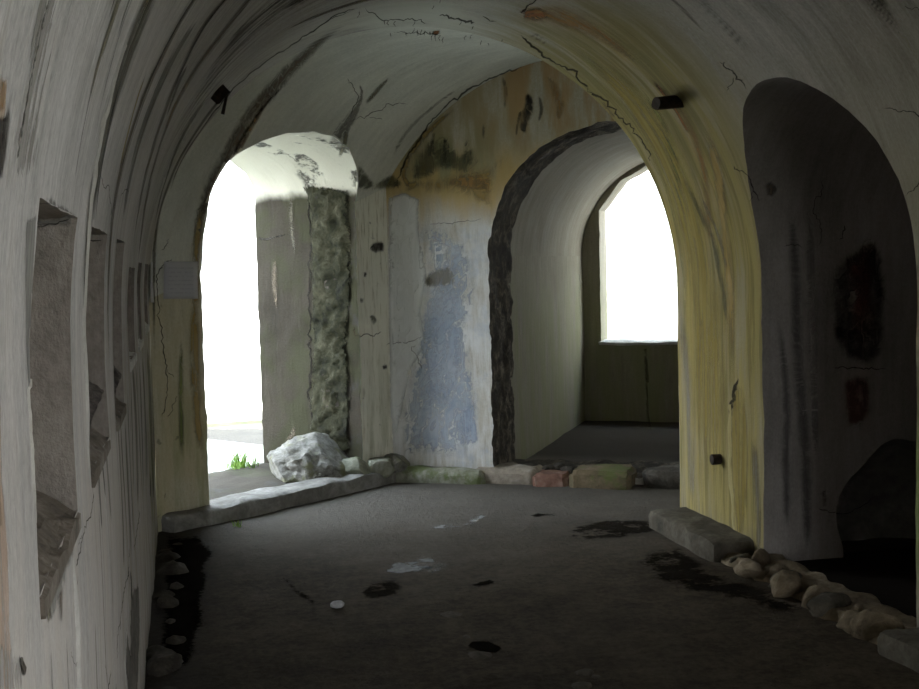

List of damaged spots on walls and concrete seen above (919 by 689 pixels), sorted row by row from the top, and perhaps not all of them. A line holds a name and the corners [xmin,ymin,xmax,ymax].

crack [204,6,493,126]
crack [397,68,518,179]
crack [522,37,651,161]
damp [834,243,884,362]
crack [76,494,94,584]
flaking render [124,576,139,689]